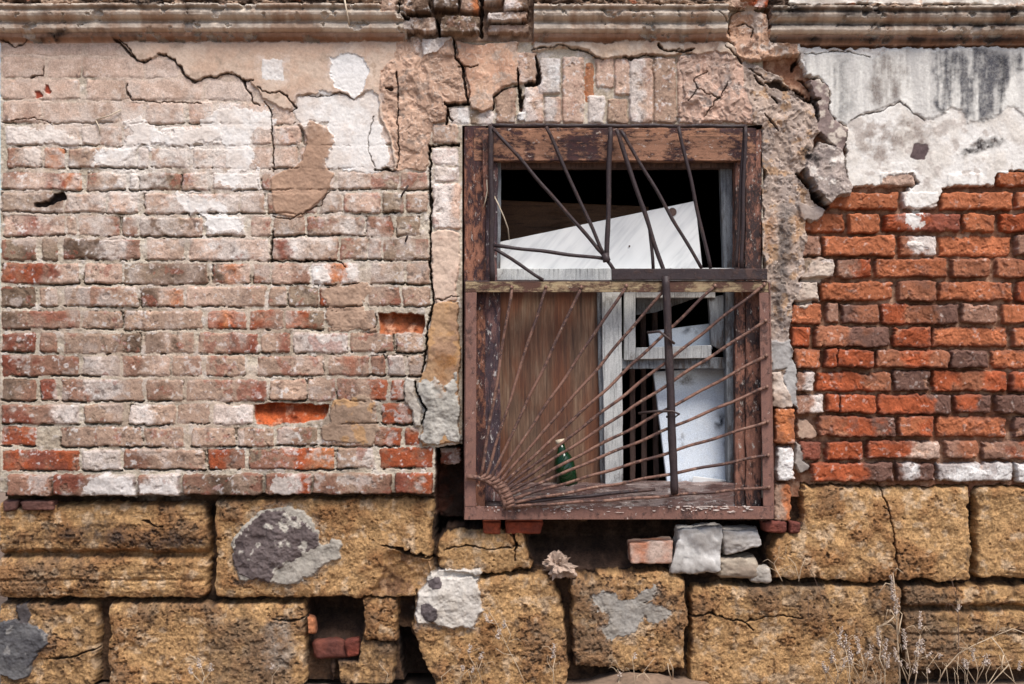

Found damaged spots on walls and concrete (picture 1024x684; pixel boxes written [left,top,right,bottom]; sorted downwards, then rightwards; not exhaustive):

spalling [34,84,52,99]
crack [113,37,401,172]
water stain [934,48,1022,117]
peeling [8,120,81,168]
spalling [34,192,67,209]
peeling [173,191,245,234]
crack [398,0,871,426]
flaking render [532,0,1024,521]
crack [382,534,522,562]
crack [876,482,900,584]
crack [688,611,804,632]